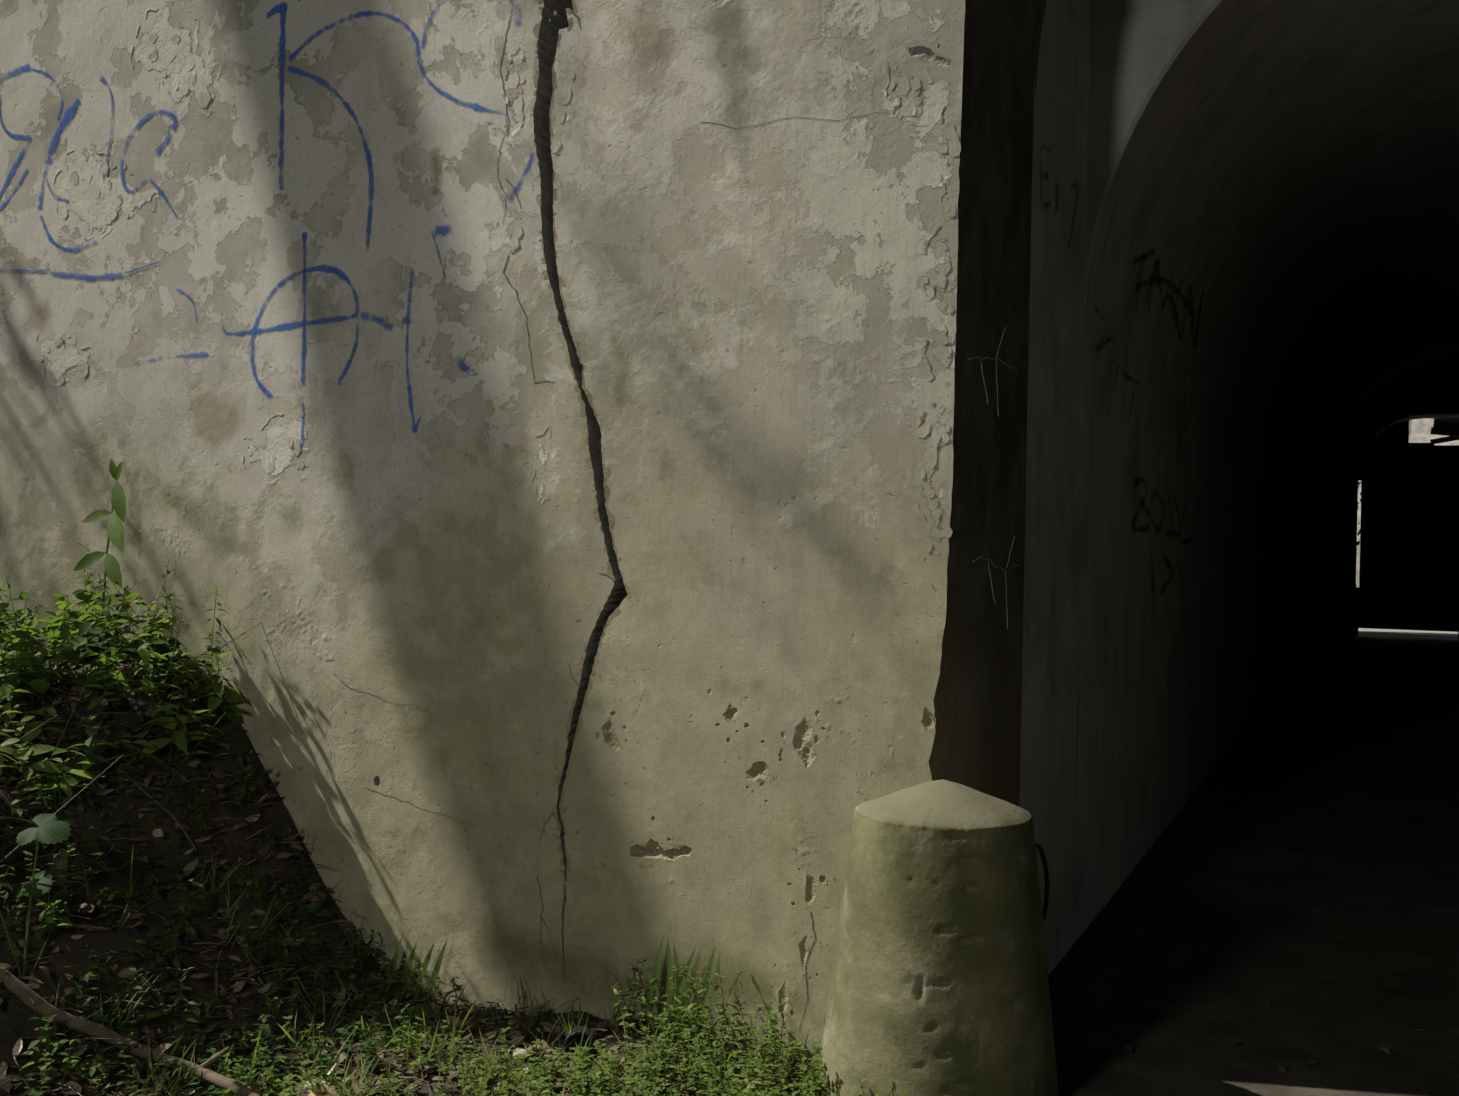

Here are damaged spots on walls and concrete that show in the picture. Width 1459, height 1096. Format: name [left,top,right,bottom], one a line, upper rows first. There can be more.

peeling [129,0,222,119]
peeling [502,43,527,145]
peeling [53,141,162,242]
peeling [881,37,961,385]
peeling [35,331,94,389]
peeling [235,410,313,486]
crack [497,0,632,983]
peeling [911,401,953,557]
spalling [596,711,627,753]
spalling [715,689,829,803]
spalling [921,707,936,731]
spalling [630,816,692,870]